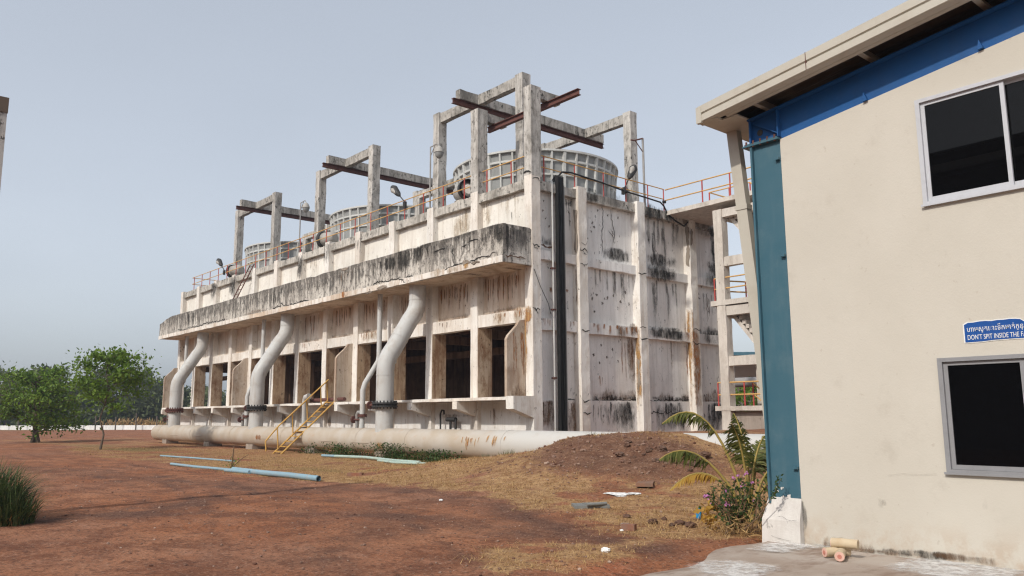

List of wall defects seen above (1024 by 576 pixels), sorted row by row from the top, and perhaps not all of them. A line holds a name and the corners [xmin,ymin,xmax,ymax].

damp [370,213,525,272]
damp [646,204,678,313]
rust [439,264,551,374]
rust [599,324,642,401]
rust [660,313,720,405]
damp [593,395,635,427]